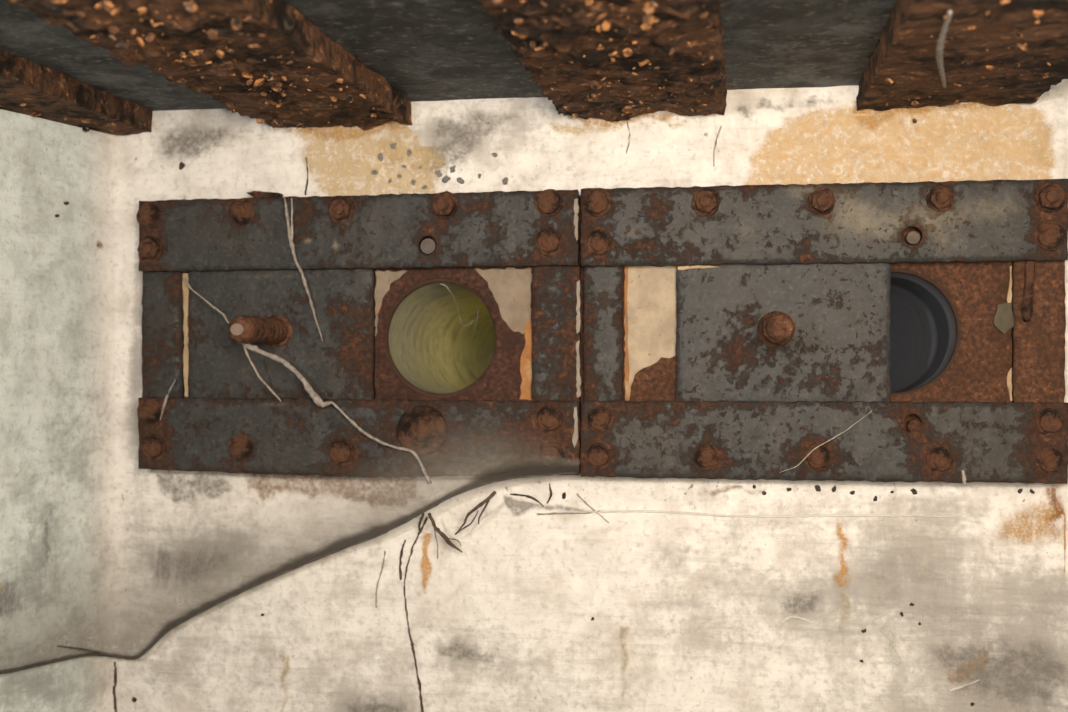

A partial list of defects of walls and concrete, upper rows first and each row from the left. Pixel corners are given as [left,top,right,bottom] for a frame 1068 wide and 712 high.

rust [520,320,532,400]
rust [1004,488,1066,550]
rust [421,534,431,588]
rust [835,527,847,586]
crack [375,516,428,712]
crack [110,662,118,712]